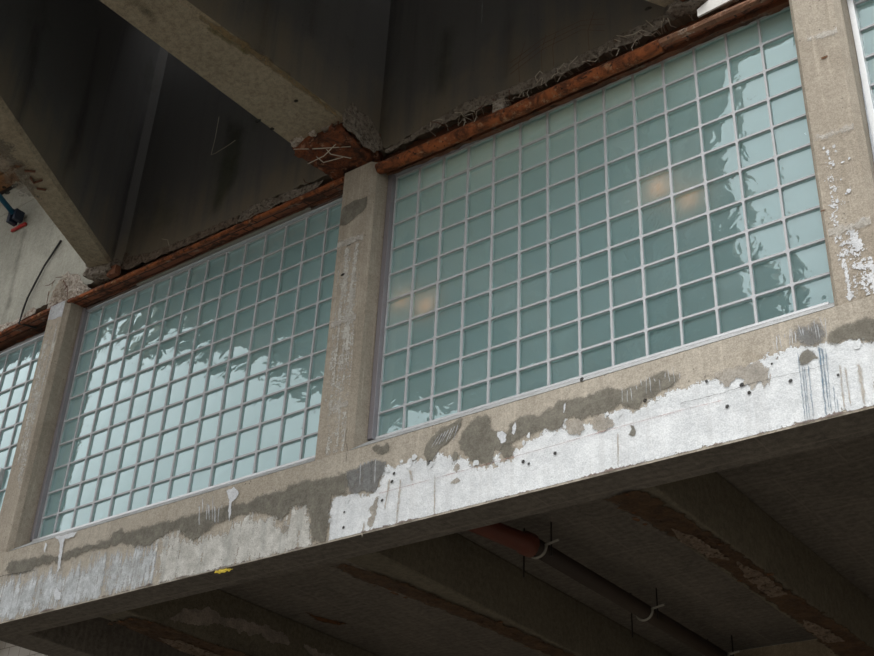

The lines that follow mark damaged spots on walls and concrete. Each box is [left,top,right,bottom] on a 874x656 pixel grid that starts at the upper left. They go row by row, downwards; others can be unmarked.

spalling [290,0,708,180]
peeling [820,144,874,301]
damp [0,443,389,620]
peeling [122,339,874,592]
peeling [169,606,290,645]